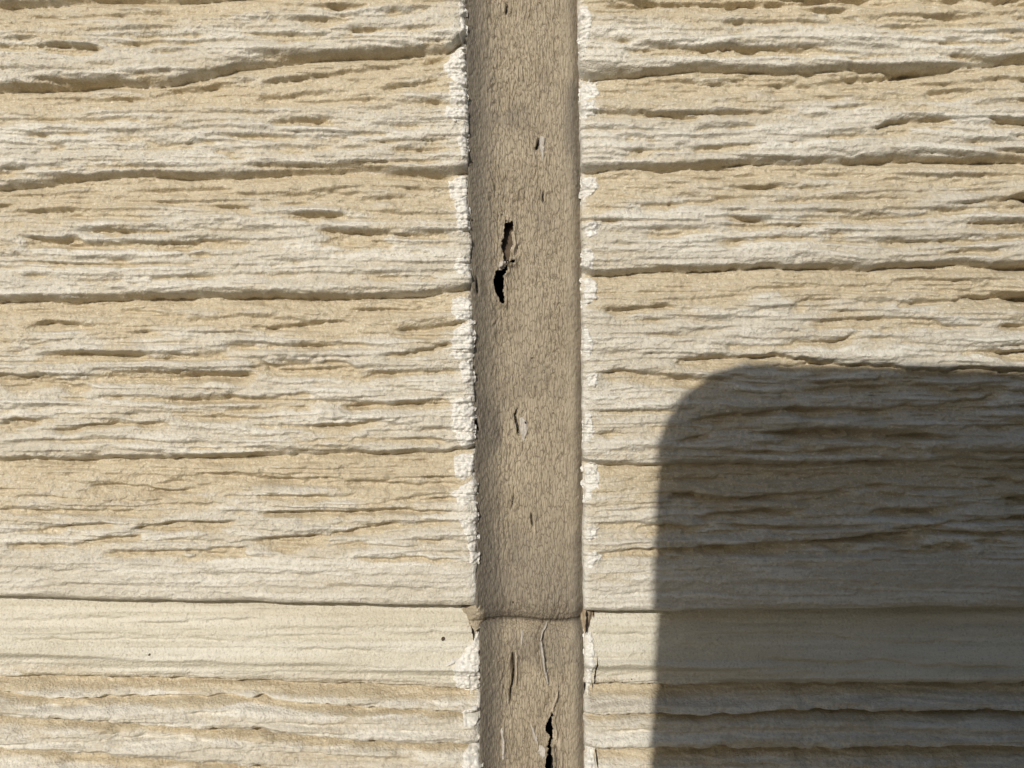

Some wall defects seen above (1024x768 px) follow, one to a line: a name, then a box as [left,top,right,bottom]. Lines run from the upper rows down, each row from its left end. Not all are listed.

crack [476,214,517,312]
crack [510,650,518,701]
crack [530,691,562,768]